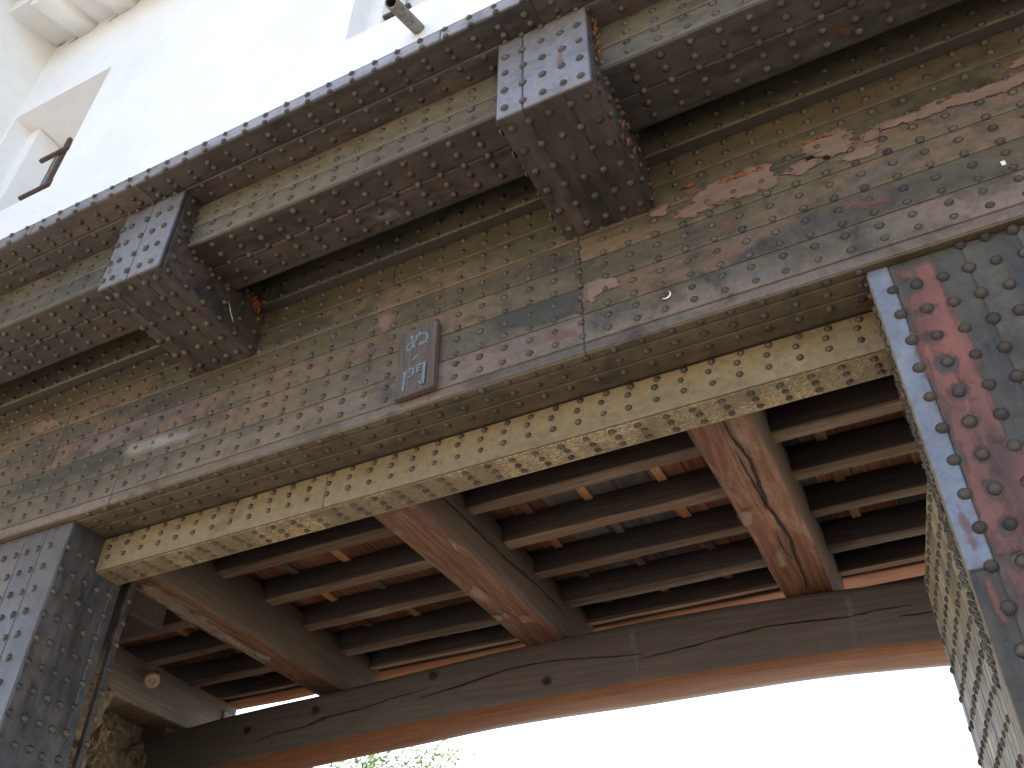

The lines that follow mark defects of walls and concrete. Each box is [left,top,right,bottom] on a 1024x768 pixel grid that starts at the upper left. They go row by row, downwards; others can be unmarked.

peeling [650,55,1024,220]
peeling [580,274,621,303]
crack [722,421,807,589]
crack [253,605,934,743]